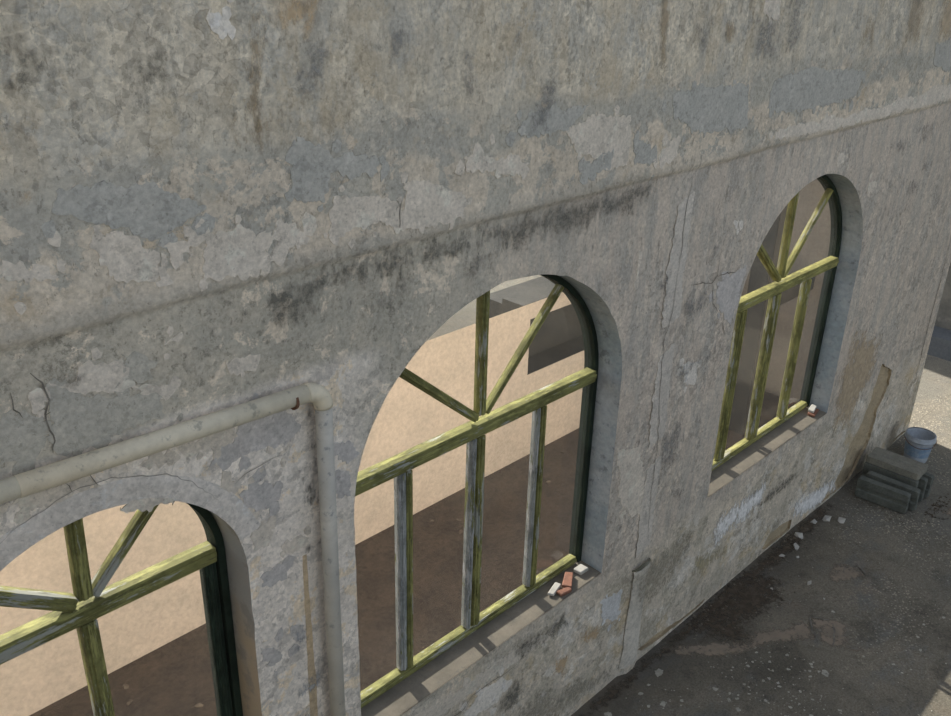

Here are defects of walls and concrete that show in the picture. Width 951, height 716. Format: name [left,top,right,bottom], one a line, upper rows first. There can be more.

peeling [454,101,681,185]
peeling [769,83,951,141]
peeling [89,172,472,292]
leakage [490,186,650,245]
peeling [661,191,695,328]
crack [10,373,56,450]
peeling [616,343,702,558]
flaking render [818,364,892,505]
peeling [120,498,175,514]
leakage [694,475,793,574]
flaking render [762,519,803,558]
flaking render [810,515,846,524]